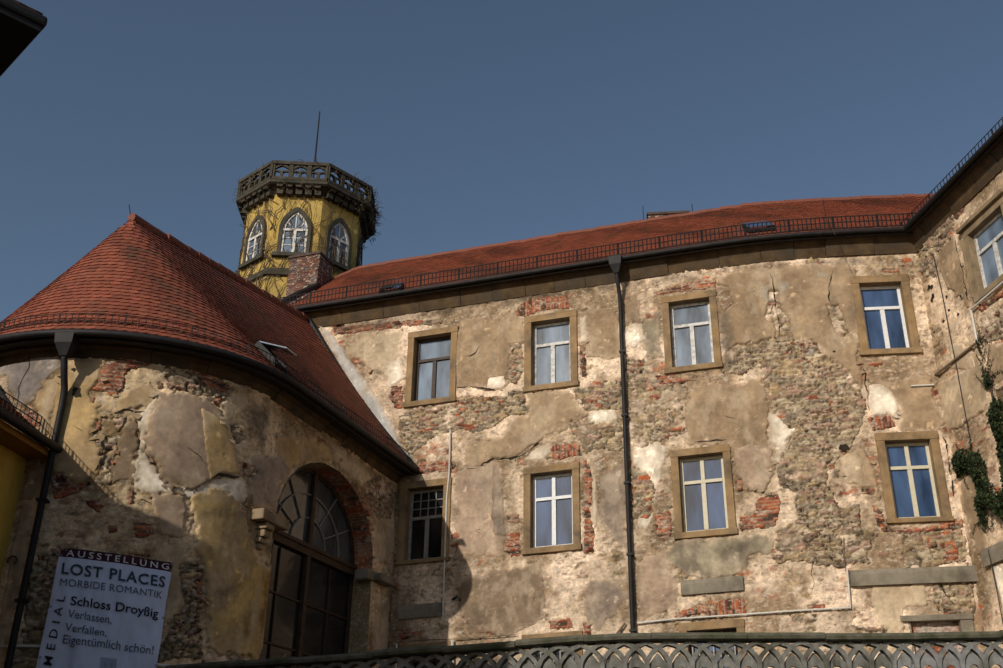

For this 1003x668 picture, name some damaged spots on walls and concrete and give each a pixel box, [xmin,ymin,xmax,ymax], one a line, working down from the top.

flaking render [0,358,423,668]
flaking render [332,207,1003,638]
crack [769,272,783,344]
spalling [777,582,984,656]